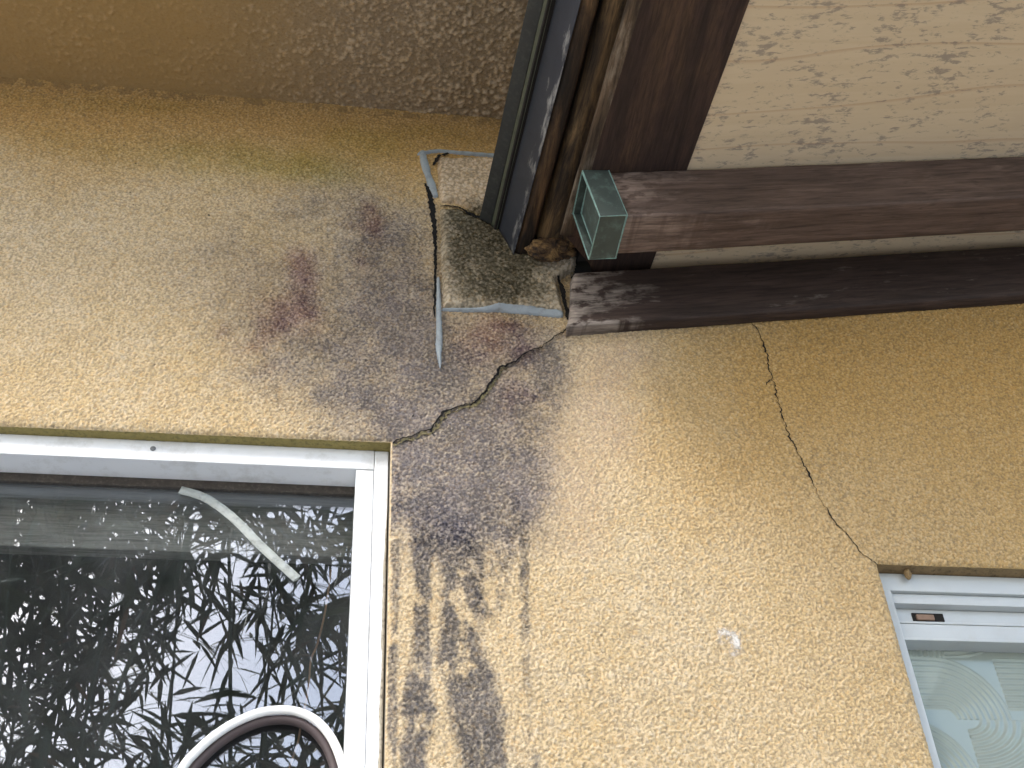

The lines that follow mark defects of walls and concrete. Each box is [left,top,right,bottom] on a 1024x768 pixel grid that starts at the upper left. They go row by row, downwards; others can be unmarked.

crack [424,152,480,317]
crack [393,275,569,446]
crack [752,324,877,564]